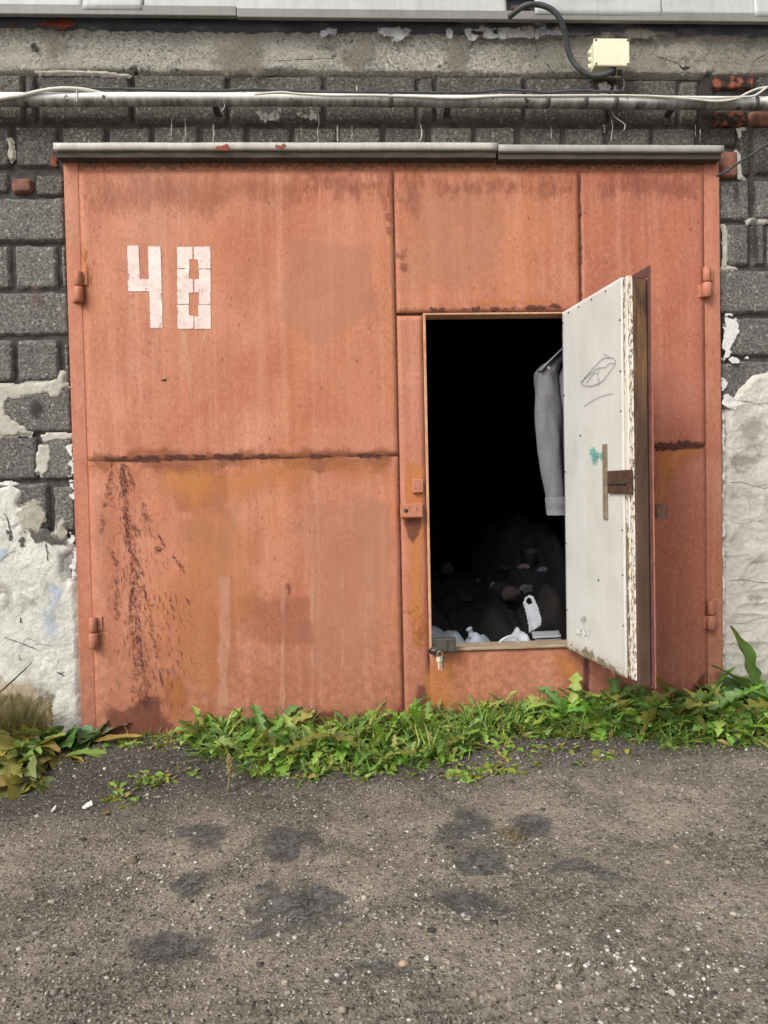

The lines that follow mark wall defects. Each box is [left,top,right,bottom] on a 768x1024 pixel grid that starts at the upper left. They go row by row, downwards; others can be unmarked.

peeling [378,27,411,42]
peeling [446,6,562,41]
peeling [603,28,707,71]
corrosion [462,300,561,312]
peeling [721,313,748,363]
corrosion [656,440,703,451]
peeling [721,377,739,502]
peeling [66,444,74,499]
peeling [6,499,77,578]
corrosion [94,449,390,712]